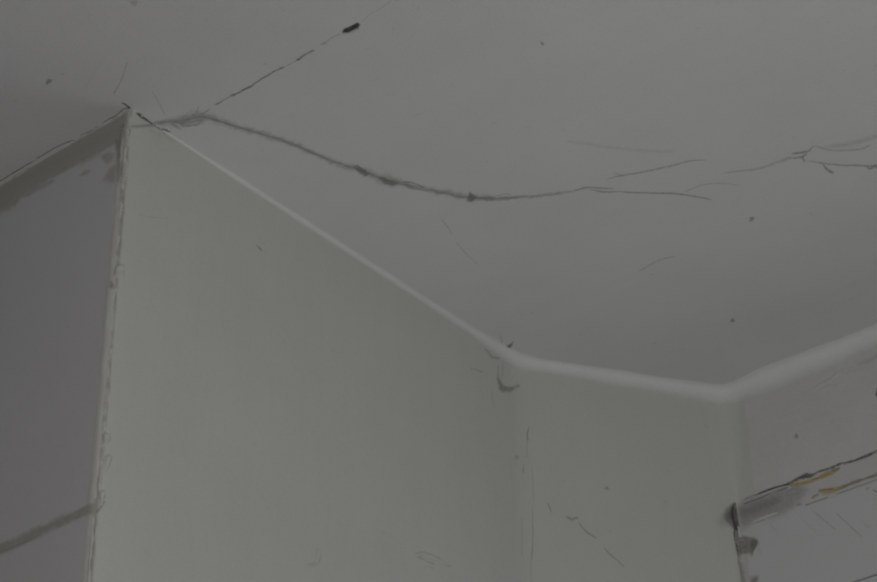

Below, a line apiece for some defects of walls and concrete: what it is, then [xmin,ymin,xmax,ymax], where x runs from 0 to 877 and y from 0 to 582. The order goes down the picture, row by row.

crack [0,33,877,203]
crack [735,449,877,505]